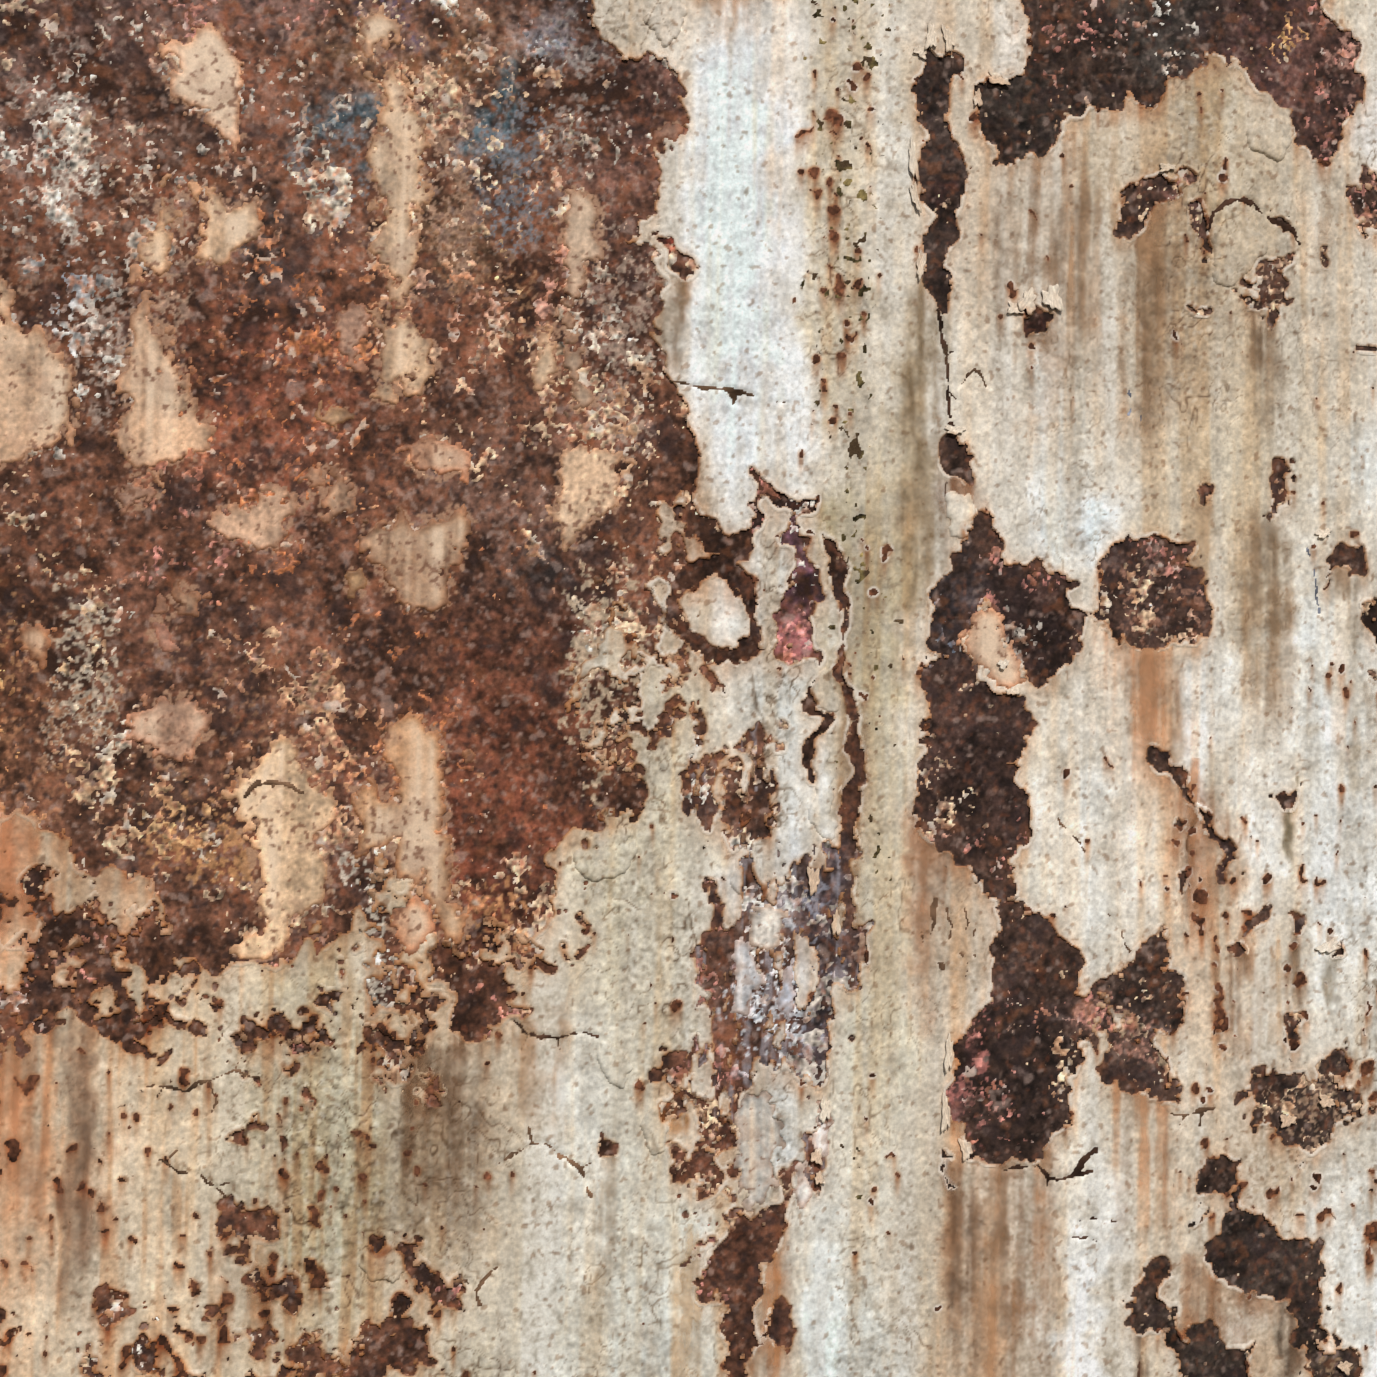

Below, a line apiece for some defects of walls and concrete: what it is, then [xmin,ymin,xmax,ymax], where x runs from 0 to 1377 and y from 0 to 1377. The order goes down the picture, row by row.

spalling [797,167,841,242]
crack [670,380,786,405]
spalling [811,311,867,425]
rust [0,0,876,1377]
peeling [956,607,1027,689]
spalling [1308,662,1352,698]
spalling [1299,864,1326,886]
spalling [1171,820,1252,1051]
spalling [1280,931,1308,1021]
spalling [1340,1058,1377,1113]
spalling [1252,1167,1321,1209]
spalling [1363,1222,1377,1265]